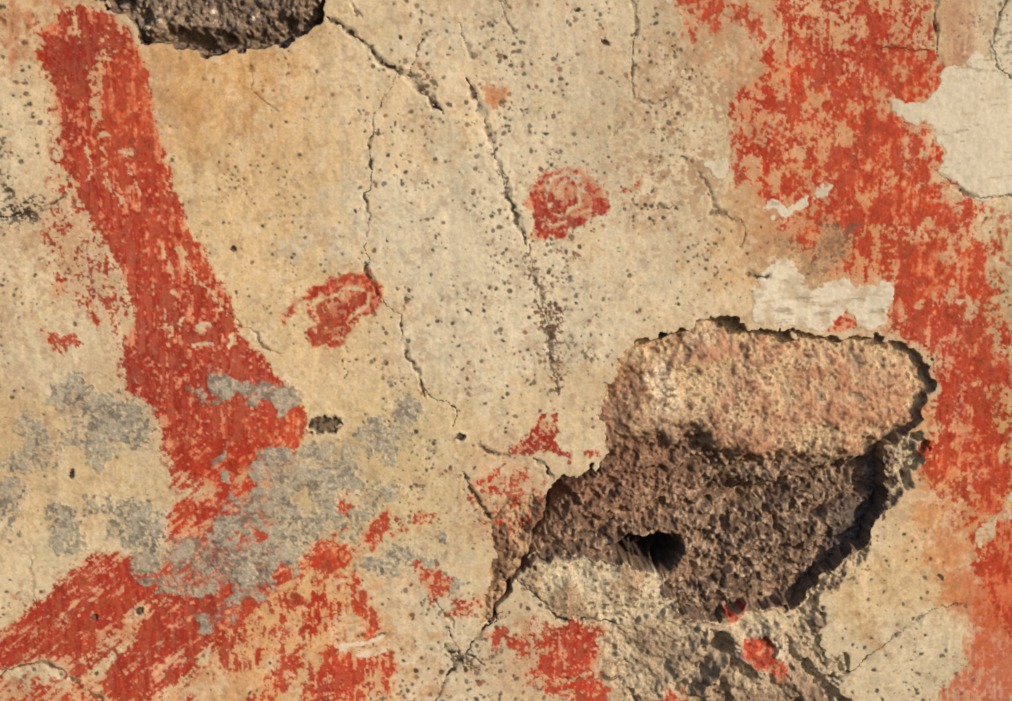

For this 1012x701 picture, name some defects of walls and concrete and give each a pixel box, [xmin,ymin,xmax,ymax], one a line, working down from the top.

spalling [95,0,326,59]
crack [499,0,517,34]
peeling [889,0,1012,202]
crack [0,194,67,218]
crack [326,1,458,427]
crack [459,22,560,395]
spalling [0,254,937,701]
crack [461,471,492,519]
crack [477,443,554,479]
crack [433,598,510,701]